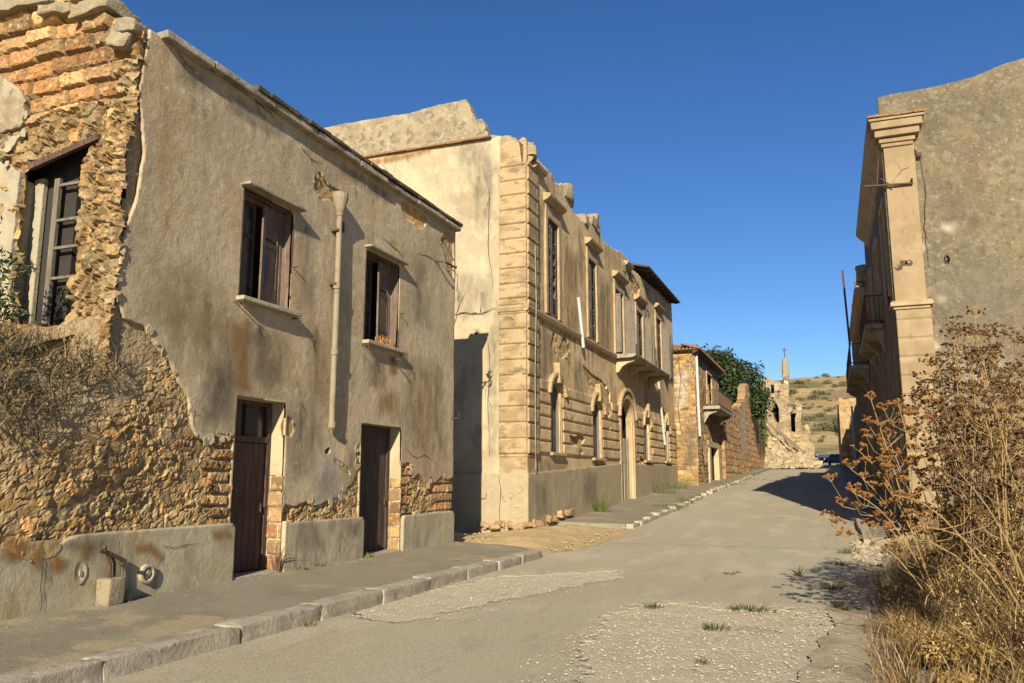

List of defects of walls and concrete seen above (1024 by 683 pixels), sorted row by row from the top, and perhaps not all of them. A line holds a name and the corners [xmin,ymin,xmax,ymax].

flaking render [0,74,32,326]
spalling [313,173,337,202]
spalling [401,203,426,230]
crack [454,165,494,323]
crack [894,160,930,265]
flaking render [194,432,231,447]
spalling [325,448,360,507]